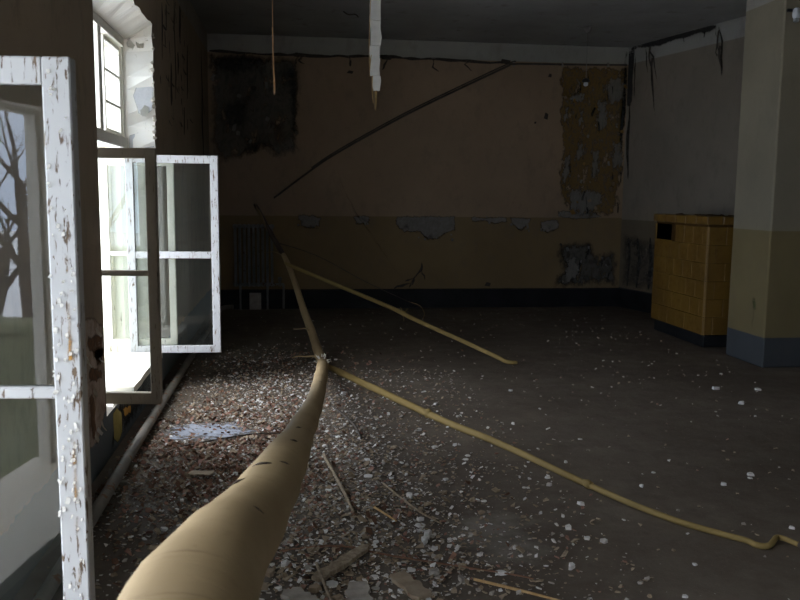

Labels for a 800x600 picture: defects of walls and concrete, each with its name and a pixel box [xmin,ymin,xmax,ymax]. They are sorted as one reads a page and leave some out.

peeling [126,0,193,148]
flaking render [52,318,131,467]